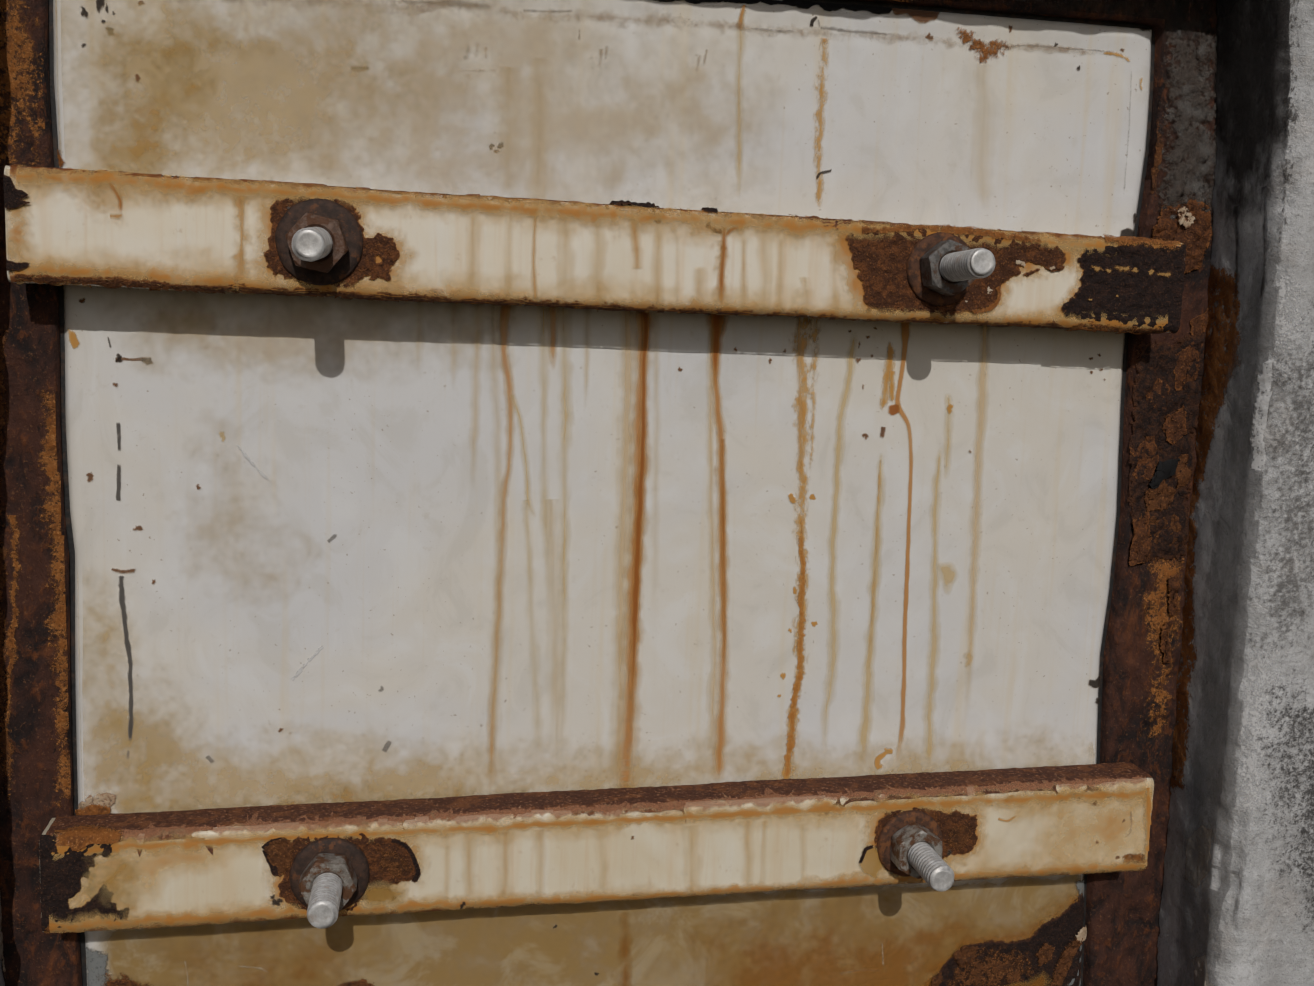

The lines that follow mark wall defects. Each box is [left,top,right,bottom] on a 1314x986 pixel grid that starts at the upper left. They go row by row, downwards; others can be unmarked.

corrosion [0,0,37,163]
corrosion [29,119,45,142]
corrosion [81,0,115,35]
corrosion [815,38,827,201]
corrosion [958,25,1012,63]
corrosion [1151,122,1163,193]
corrosion [0,329,21,799]
corrosion [9,149,1213,933]
corrosion [1127,264,1242,794]
corrosion [104,973,149,986]
damp [106,874,1080,986]
corrosion [923,892,1087,986]